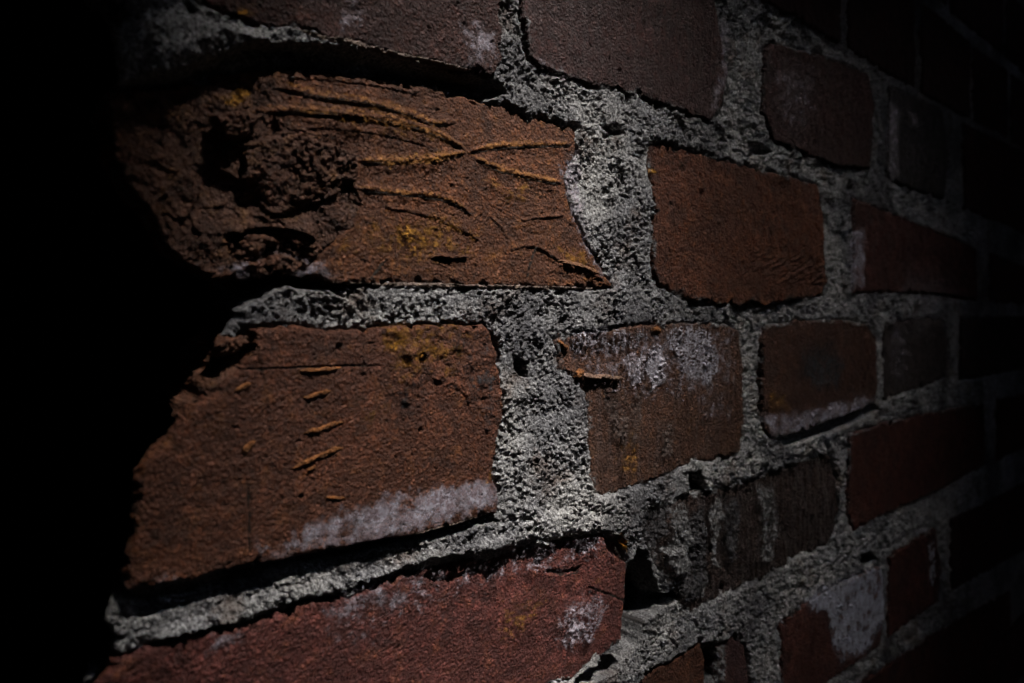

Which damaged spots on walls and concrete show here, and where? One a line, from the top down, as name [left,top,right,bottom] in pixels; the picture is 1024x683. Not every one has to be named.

spalling [97,75,362,292]
crack [365,191,463,211]
crack [286,89,568,184]
water stain [572,325,729,444]
water stain [281,480,498,556]